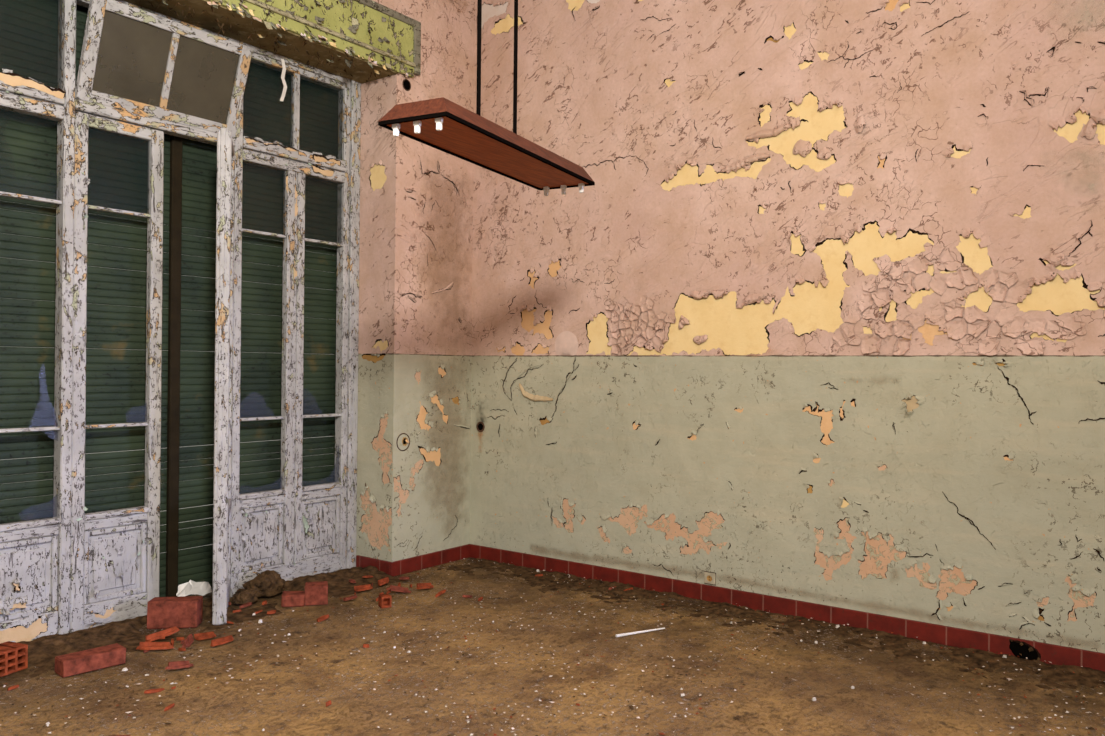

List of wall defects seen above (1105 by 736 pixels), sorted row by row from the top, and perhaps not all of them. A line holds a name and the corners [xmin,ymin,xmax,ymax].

peeling [764,20,796,44]
peeling [661,91,848,192]
peeling [586,312,612,355]
peeling [625,220,993,356]
crack [828,242,1105,424]
peeling [1016,254,1105,343]
peeling [416,390,462,430]
crack [454,357,579,445]
peeling [360,410,442,552]
peeling [597,502,727,555]
peeling [813,479,978,611]
crack [943,493,996,550]